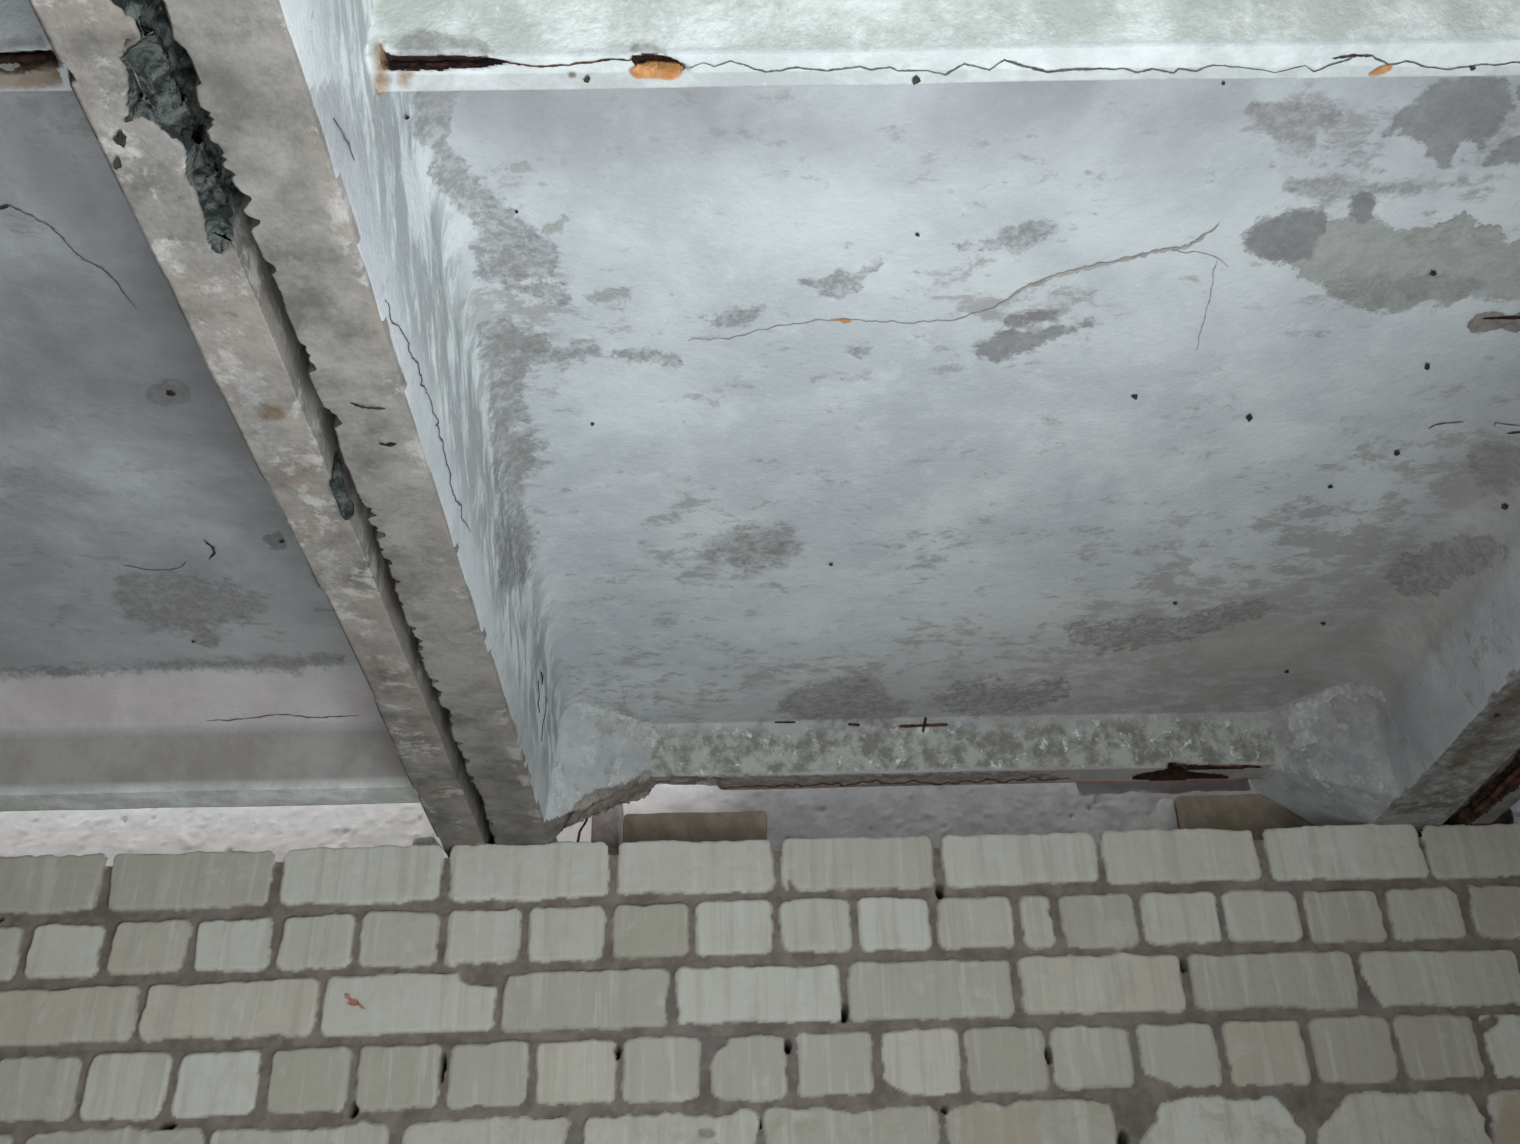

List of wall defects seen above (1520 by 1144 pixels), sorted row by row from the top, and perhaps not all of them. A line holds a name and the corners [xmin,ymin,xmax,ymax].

crack [333,118,355,161]
damp [1382,76,1520,169]
crack [0,204,136,308]
crack [688,224,1228,350]
damp [976,311,1092,363]
damp [1241,193,1520,316]
spalling [1467,311,1520,333]
crack [350,403,397,447]
crack [385,300,471,532]
crack [125,539,216,571]